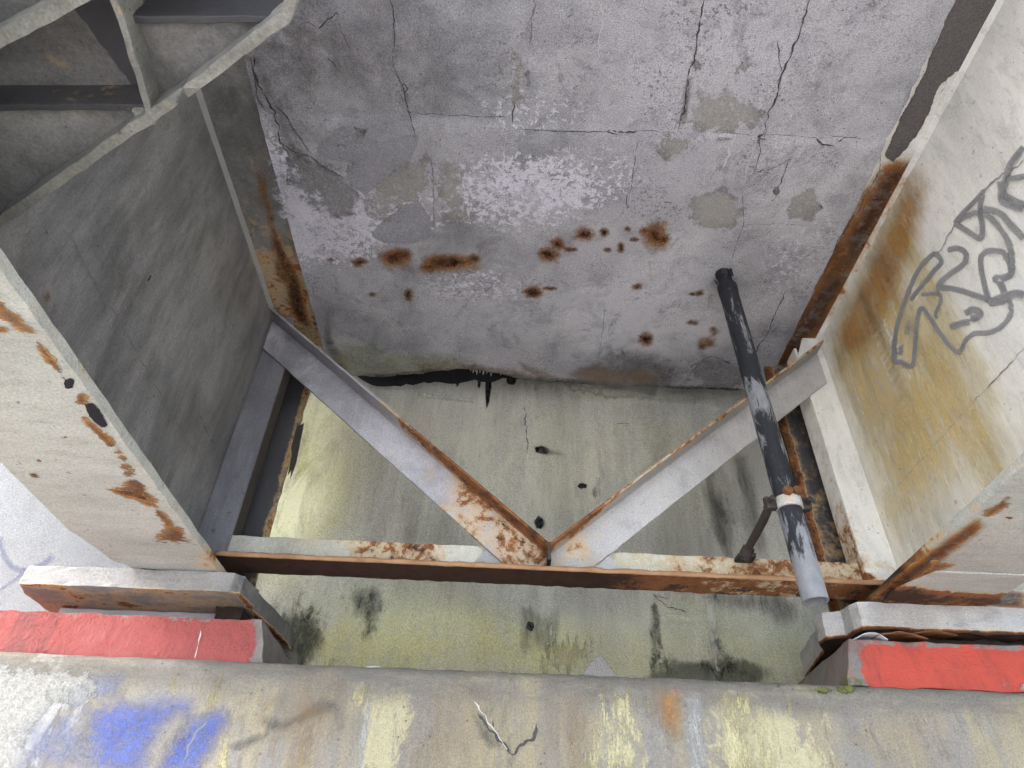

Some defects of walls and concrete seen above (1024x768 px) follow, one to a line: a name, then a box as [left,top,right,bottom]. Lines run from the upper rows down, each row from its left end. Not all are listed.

crack [251,57,346,180]
crack [390,0,704,217]
crack [716,0,860,258]
rust [0,302,66,380]
water stain [420,354,709,407]
rust [539,222,669,260]
crack [685,150,885,390]
rust [778,160,933,433]
rust [105,433,188,544]
rust [215,550,796,582]
rust [823,497,1024,608]
crack [475,702,538,756]